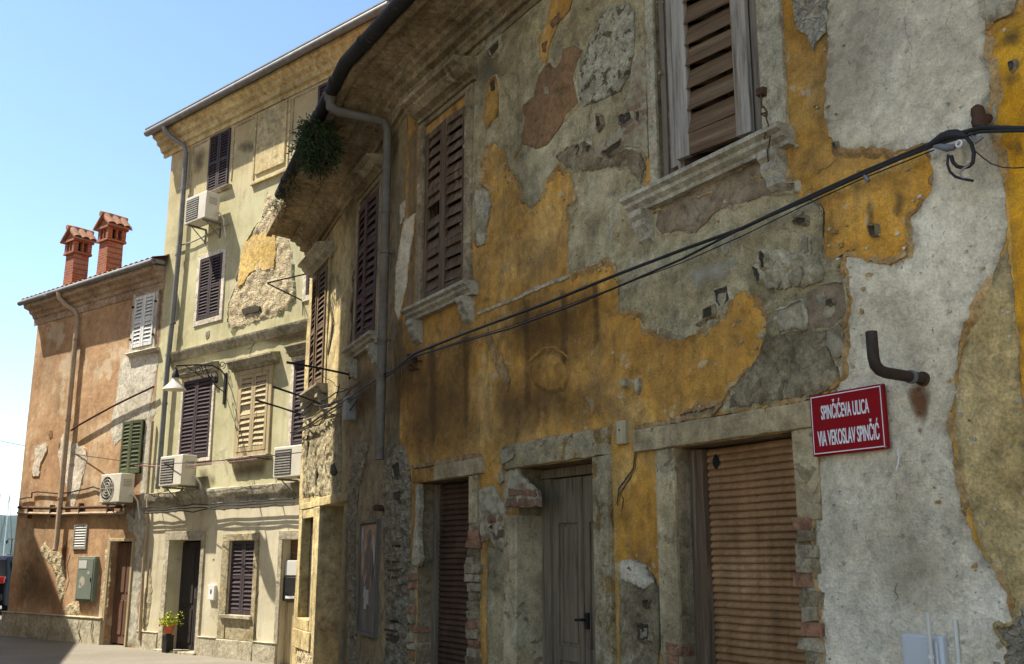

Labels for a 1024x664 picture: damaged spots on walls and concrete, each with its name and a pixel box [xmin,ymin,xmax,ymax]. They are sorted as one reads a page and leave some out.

spalling [227,191,296,334]
peeling [459,0,1024,664]
rust [909,387,927,432]
peeling [32,430,87,506]
peeling [302,413,342,497]